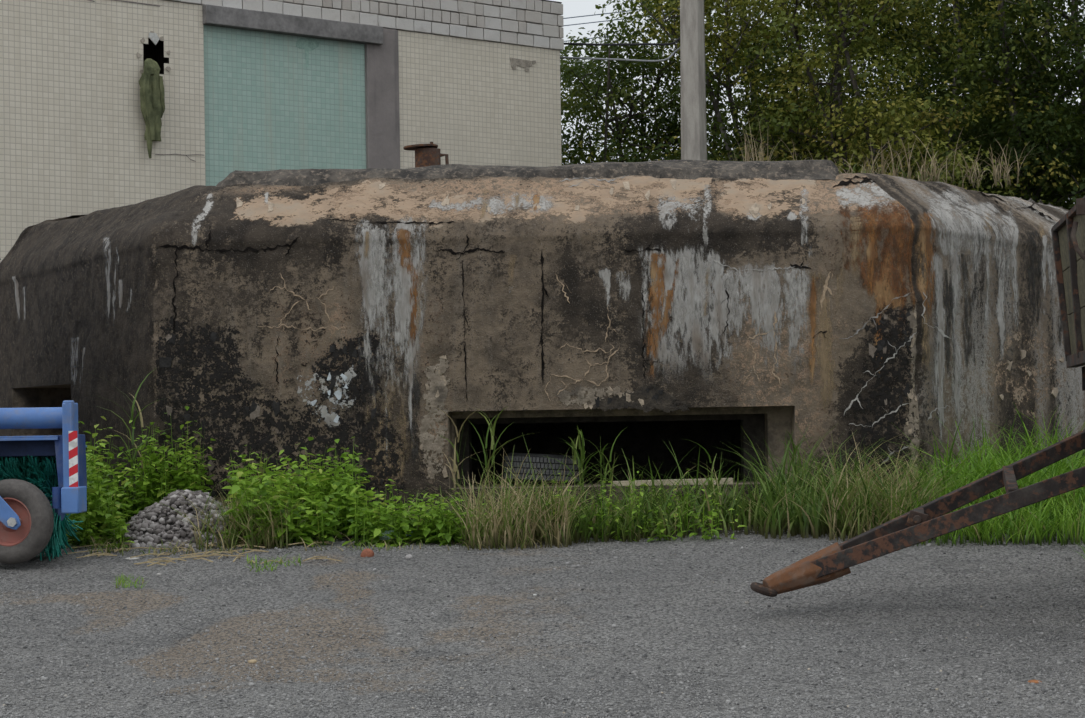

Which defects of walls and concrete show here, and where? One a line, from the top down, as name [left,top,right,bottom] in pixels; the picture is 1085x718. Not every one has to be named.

spalling [137,31,171,82]
peeling [154,315,405,510]
damp [355,217,426,483]
corrosion [397,229,421,343]
crack [330,214,505,402]
spalling [418,355,451,479]
crack [538,252,659,400]
corrosion [646,253,679,376]
damp [599,185,810,369]
crack [711,256,951,427]
corrosion [837,201,936,362]
damp [931,197,1019,441]